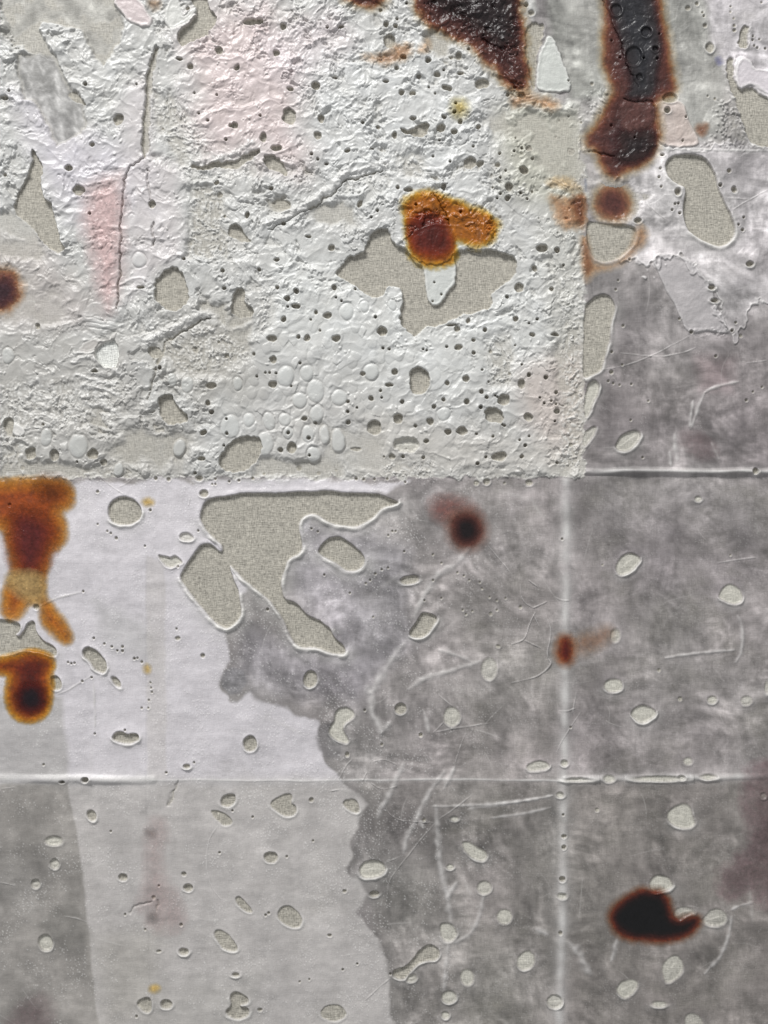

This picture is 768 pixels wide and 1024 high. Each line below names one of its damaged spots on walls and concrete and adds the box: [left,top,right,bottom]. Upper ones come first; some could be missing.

peeling [11,147,68,255]
crack [115,44,158,309]
peeling [333,224,521,340]
rust [401,189,499,269]
rust [550,179,605,277]
peeling [584,219,639,265]
rust [619,228,645,263]
peeling [659,101,739,250]
peeling [579,291,618,449]
rust [0,477,75,645]
peeling [157,487,401,658]
rust [0,648,56,724]